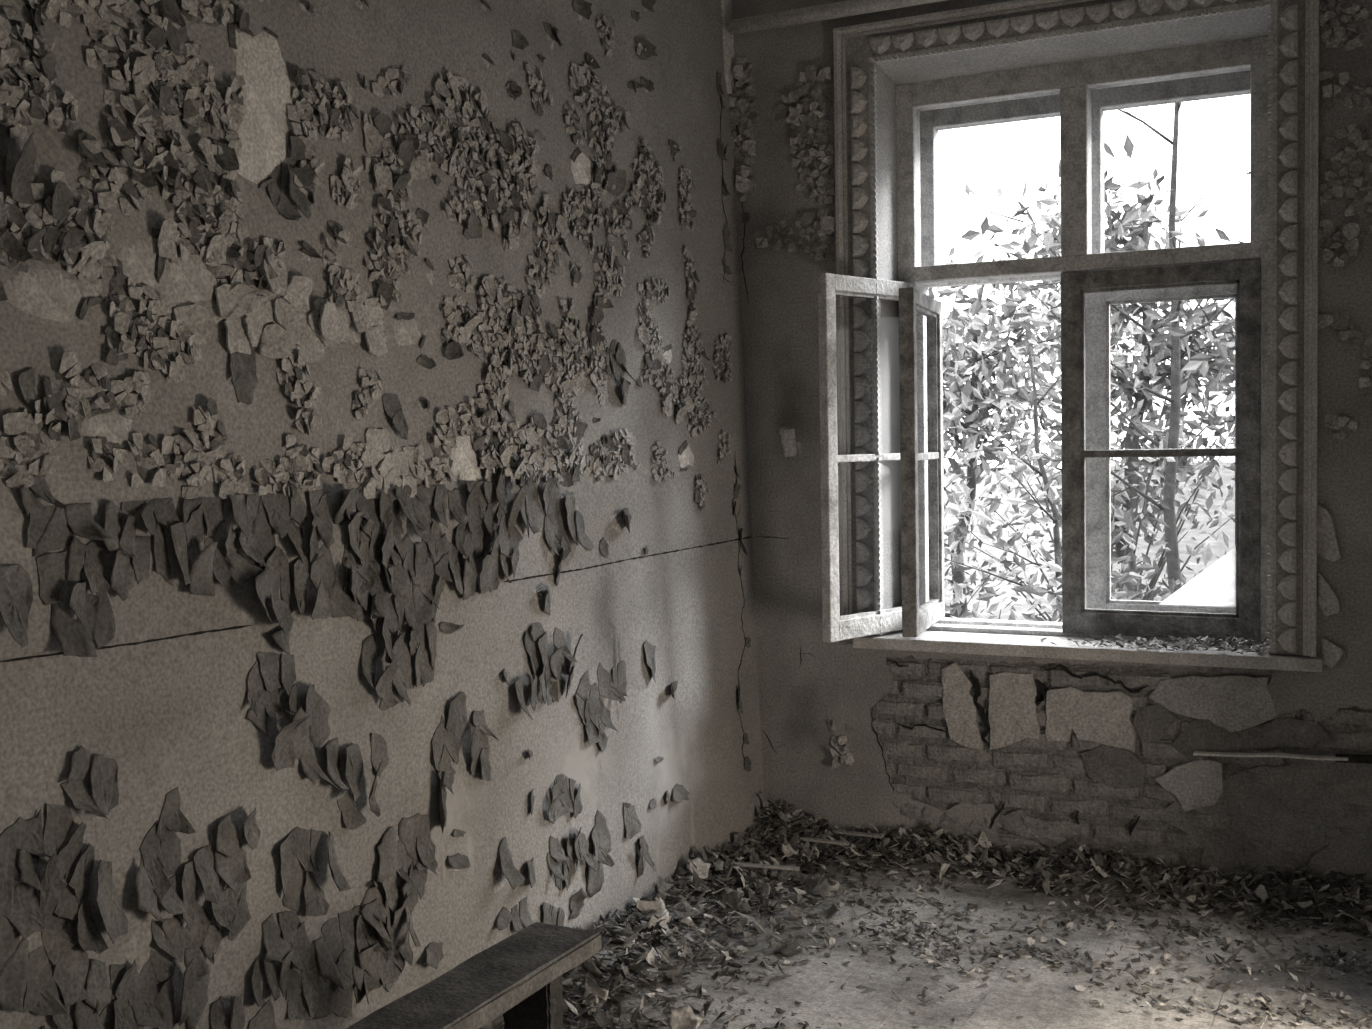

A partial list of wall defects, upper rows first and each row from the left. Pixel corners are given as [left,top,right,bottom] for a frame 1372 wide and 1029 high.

peeling [1319,0,1372,51]
flaking render [0,0,733,1029]
flaking render [826,657,1372,879]